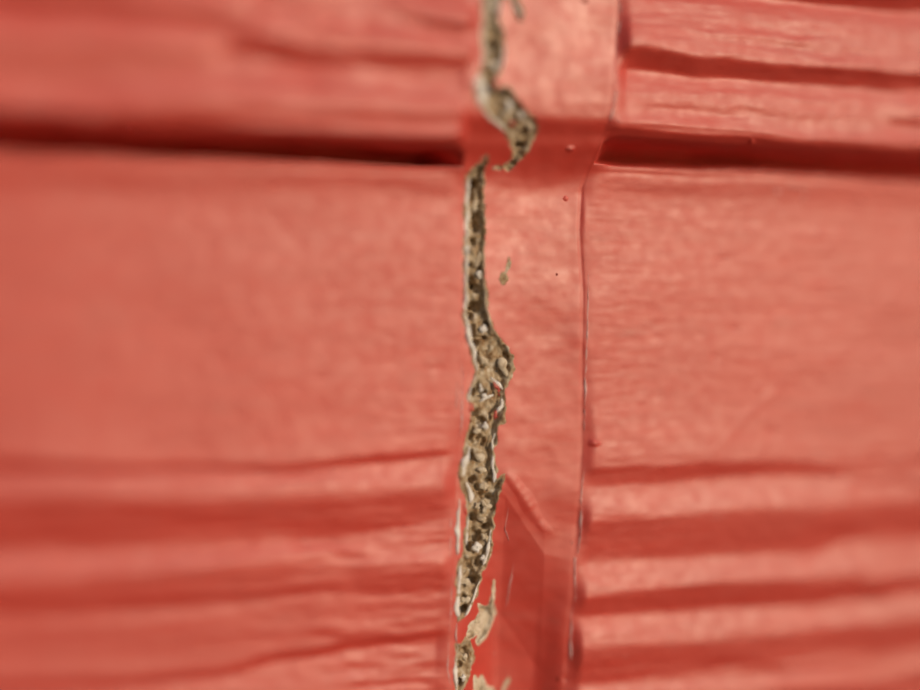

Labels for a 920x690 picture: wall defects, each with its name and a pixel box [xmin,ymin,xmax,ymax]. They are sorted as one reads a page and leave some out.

peeling [453,0,538,690]